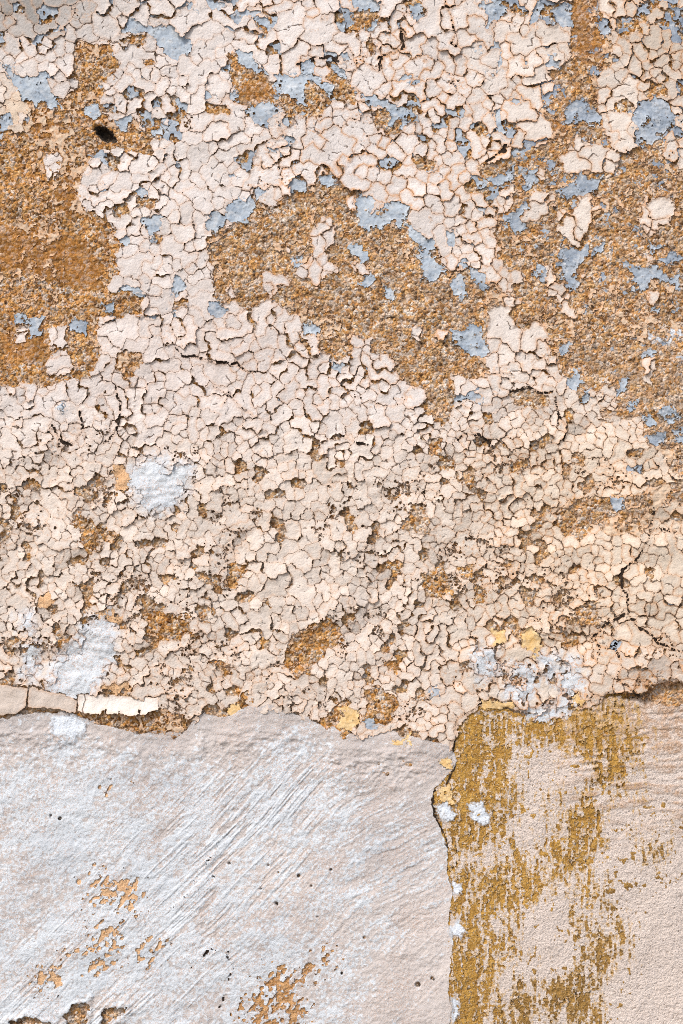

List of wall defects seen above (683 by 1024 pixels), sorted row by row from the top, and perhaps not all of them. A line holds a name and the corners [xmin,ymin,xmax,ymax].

crack [296,55,340,66]
crack [377,31,405,71]
crack [483,144,507,165]
crack [51,384,121,446]
crack [175,347,259,411]
flaking render [0,0,683,768]
crack [457,433,494,447]
crack [509,386,568,450]
crack [591,507,680,697]
peeling [436,396,683,1024]